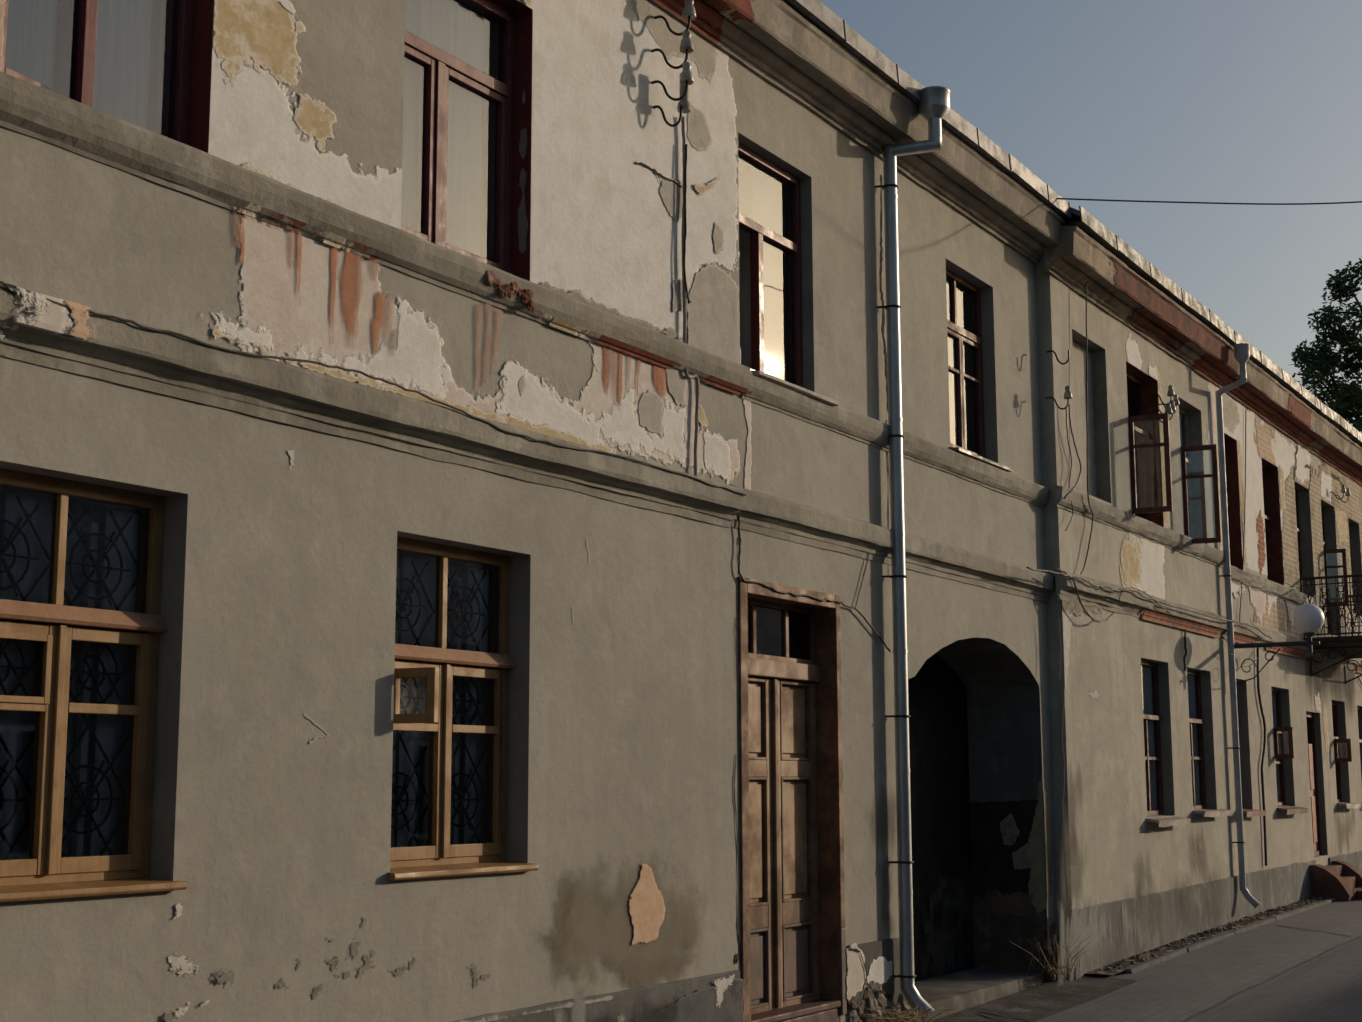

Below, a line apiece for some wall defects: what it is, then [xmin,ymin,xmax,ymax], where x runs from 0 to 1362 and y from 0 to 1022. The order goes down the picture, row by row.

peeling [201,0,755,490]
peeling [0,287,94,356]
corrosion [330,246,378,338]
corrosion [373,292,393,354]
spalling [1110,256,1362,660]
peeling [629,863,666,945]
spalling [168,953,236,986]
spalling [312,916,416,1000]
damp [556,999,585,1022]
spalling [460,974,745,1022]
peeling [846,943,916,1022]